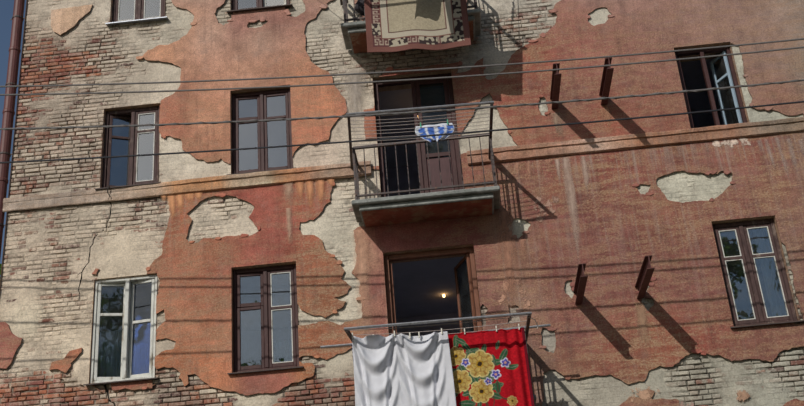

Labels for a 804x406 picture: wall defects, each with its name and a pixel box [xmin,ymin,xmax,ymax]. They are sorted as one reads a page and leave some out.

spalling [215,0,233,25]
spalling [284,0,306,17]
spalling [586,8,614,26]
spalling [9,0,197,198]
spalling [158,133,232,182]
spalling [293,0,560,325]
spalling [631,170,735,203]
crack [78,185,112,301]
spalling [0,193,355,406]
spalling [564,281,575,298]
spalling [542,347,804,406]